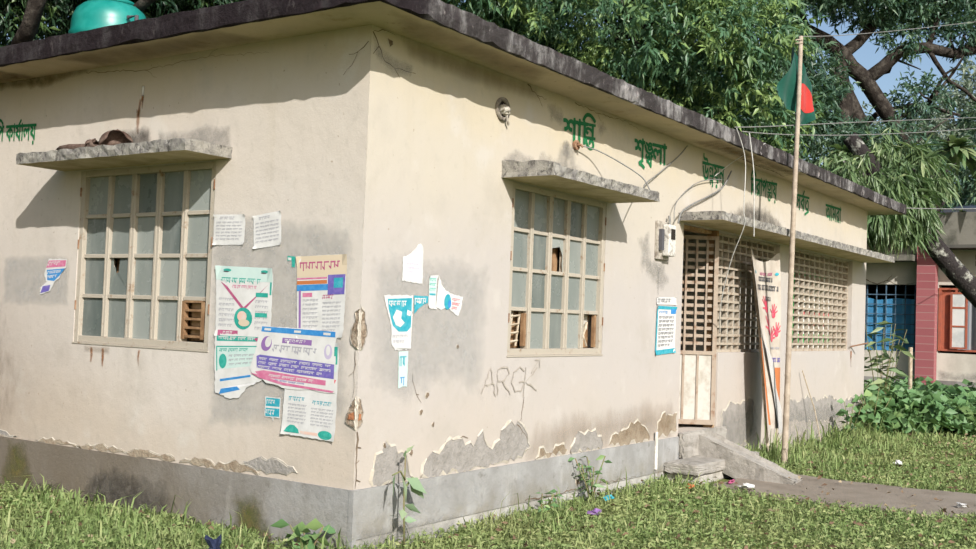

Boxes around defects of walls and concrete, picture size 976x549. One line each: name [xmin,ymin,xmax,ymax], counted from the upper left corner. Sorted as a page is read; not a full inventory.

crack [343,29,416,76]
spalling [350,306,368,351]
spalling [346,396,364,431]
peeling [36,437,298,476]
peeling [369,411,678,486]